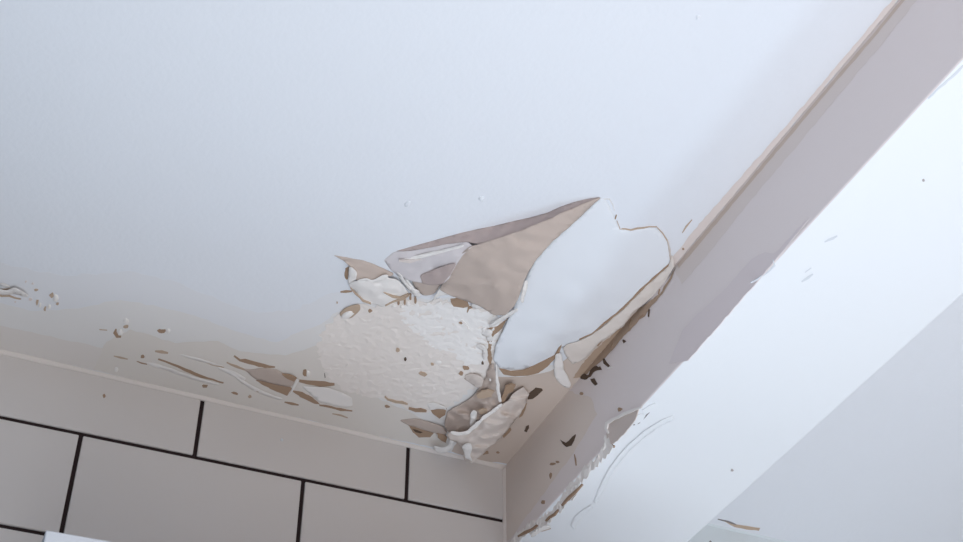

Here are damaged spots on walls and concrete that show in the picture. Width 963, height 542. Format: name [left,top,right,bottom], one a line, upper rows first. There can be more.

flaking render [218,198,684,463]